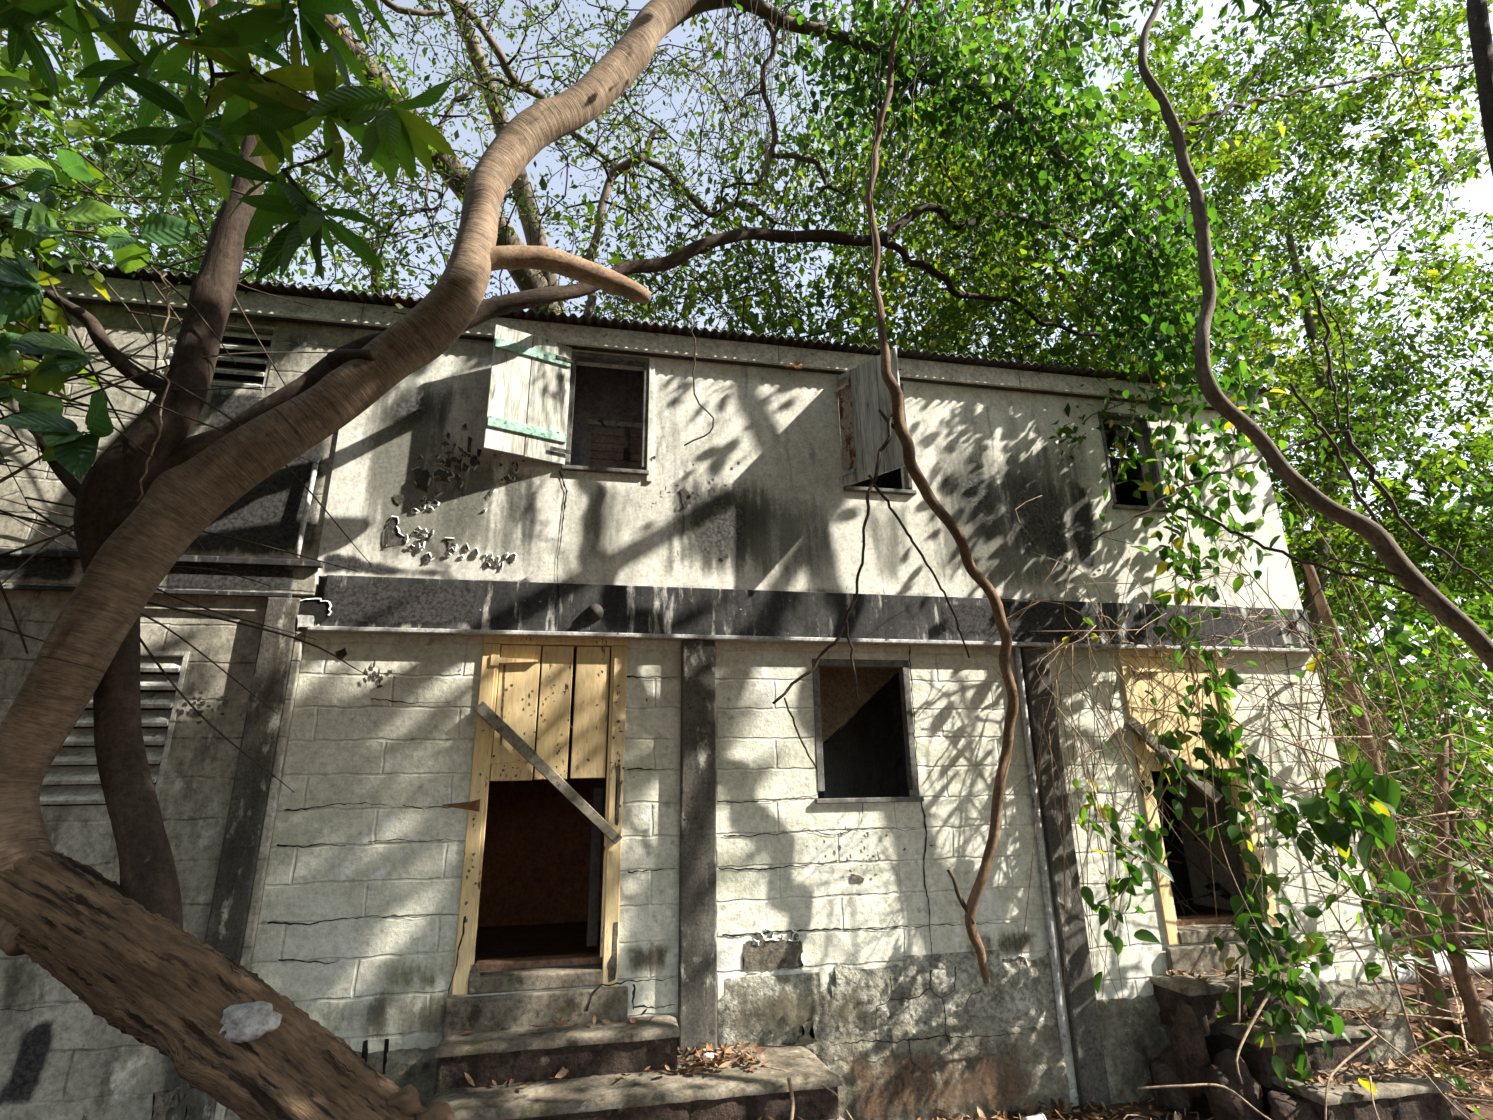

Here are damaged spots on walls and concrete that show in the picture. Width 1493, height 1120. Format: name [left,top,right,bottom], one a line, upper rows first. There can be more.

peeling [385,424,527,570]
damp [677,483,829,574]
damp [911,445,1095,637]
crack [717,645,1023,1070]